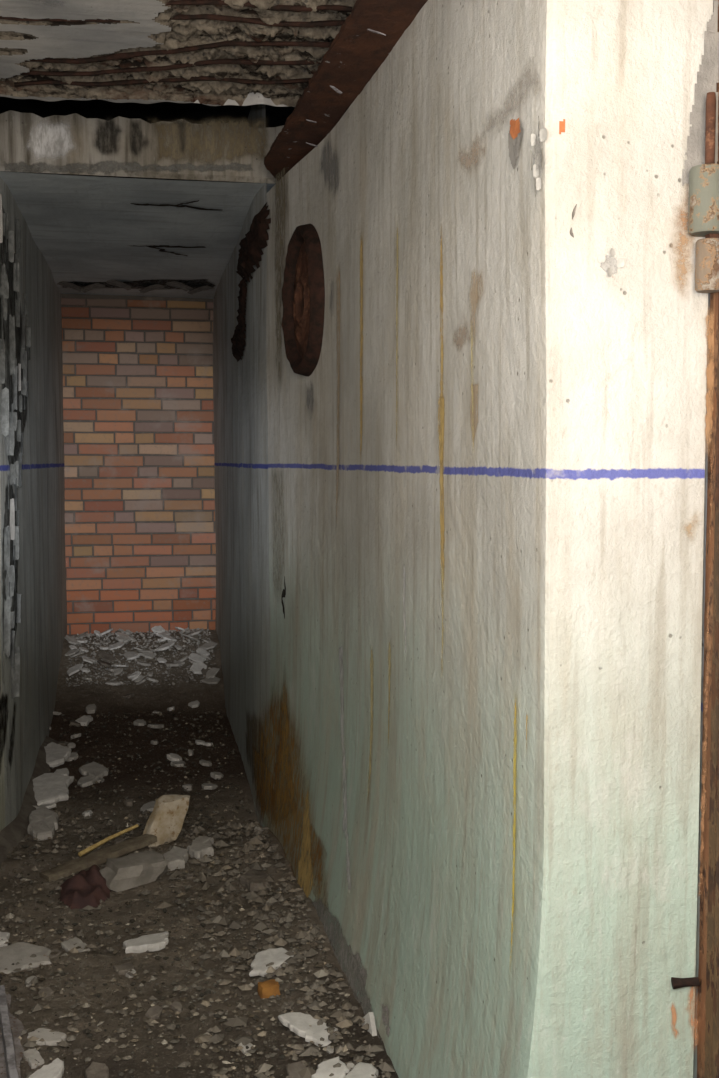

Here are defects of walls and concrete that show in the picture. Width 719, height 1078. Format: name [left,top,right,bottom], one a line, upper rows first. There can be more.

spalling [0,0,356,107]
spalling [5,161,252,174]
peeling [57,279,215,295]
corrosion [676,203,692,285]
corrosion [705,314,714,444]
peeling [0,194,31,767]